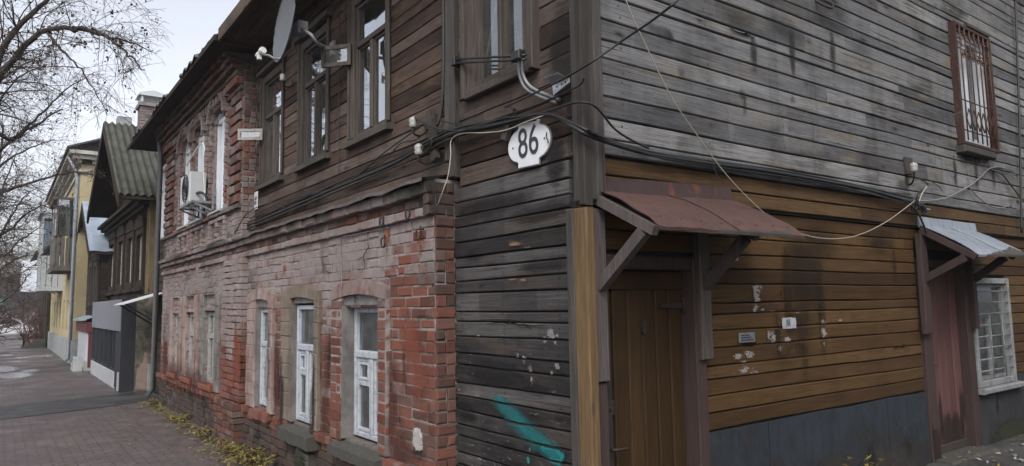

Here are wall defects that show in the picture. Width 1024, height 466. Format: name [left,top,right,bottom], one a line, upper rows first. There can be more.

peeling [753,285,776,312]
peeling [733,351,758,374]